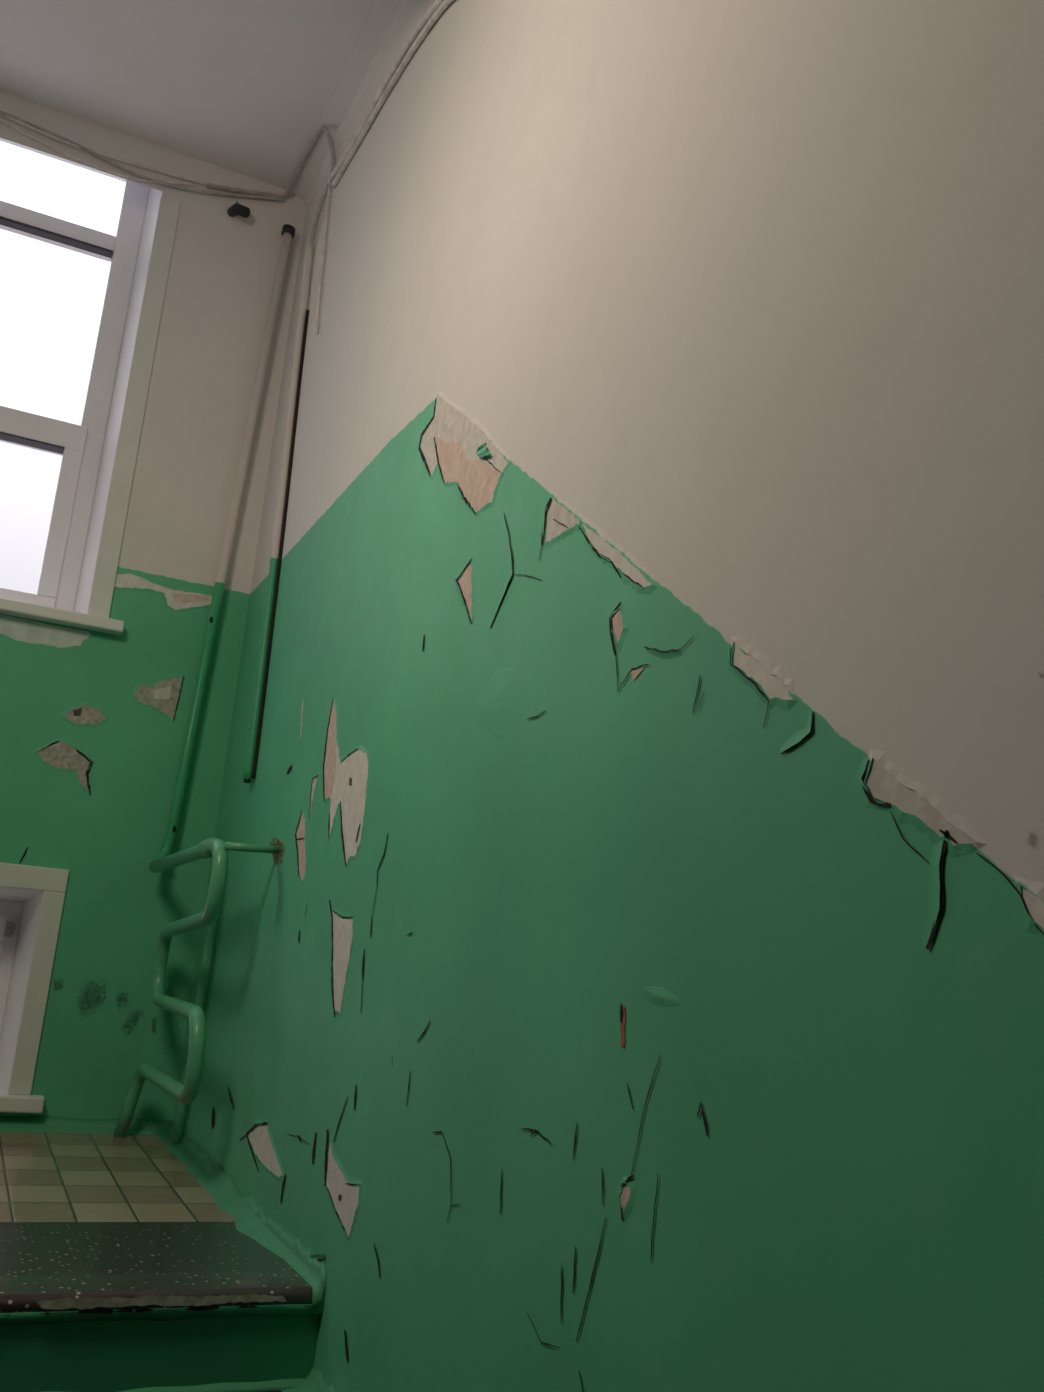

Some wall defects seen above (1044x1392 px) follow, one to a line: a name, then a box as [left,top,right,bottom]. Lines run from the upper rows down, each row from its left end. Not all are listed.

peeling [418,392,511,516]
peeling [114,570,213,623]
peeling [538,492,658,691]
peeling [295,698,371,885]
peeling [852,749,1044,945]
peeling [329,900,355,1018]
peeling [324,1096,362,1241]
crack [406,1021,430,1107]
crack [433,1131,459,1222]
crack [497,1171,505,1214]
crack [521,1055,660,1392]
crack [697,1102,707,1136]